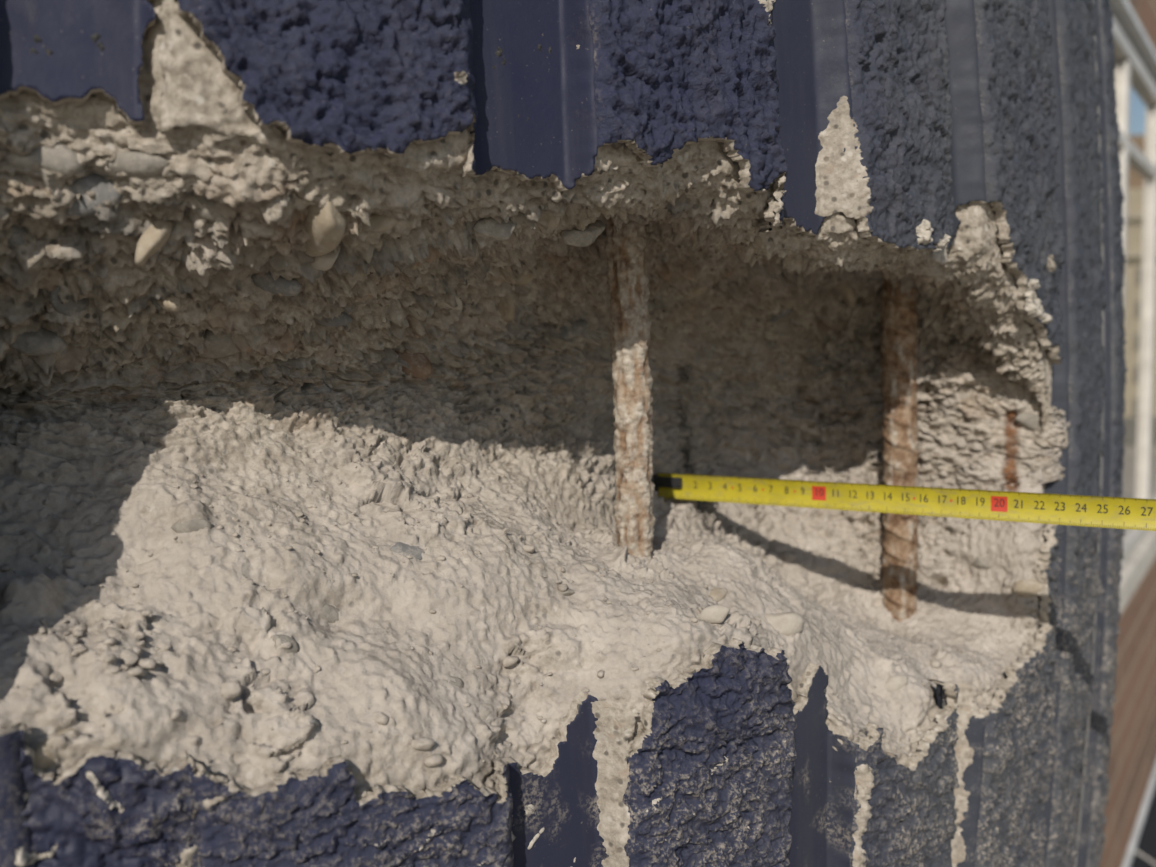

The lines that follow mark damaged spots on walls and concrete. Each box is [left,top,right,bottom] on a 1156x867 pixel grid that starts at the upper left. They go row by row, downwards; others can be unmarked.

peeling [138,0,257,145]
peeling [454,71,469,85]
spalling [0,91,1070,799]
peeling [14,844,58,867]
peeling [591,701,639,867]
peeling [852,764,875,867]
peeling [951,683,975,867]